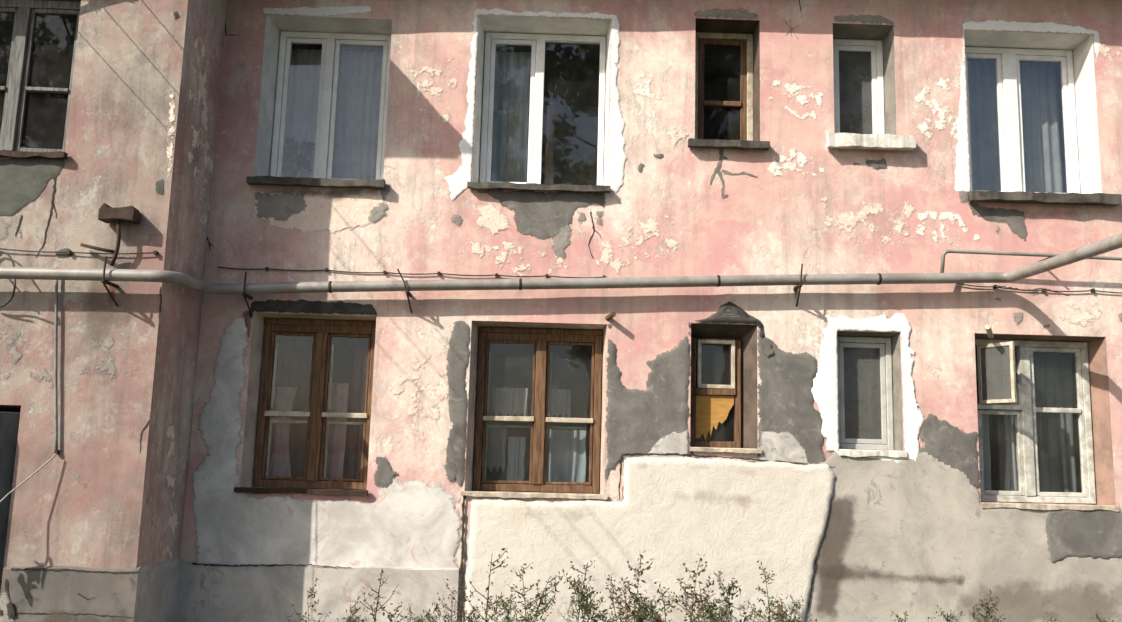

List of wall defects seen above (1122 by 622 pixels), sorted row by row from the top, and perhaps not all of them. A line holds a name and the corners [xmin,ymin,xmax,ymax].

peeling [769,77,823,119]
peeling [906,77,967,150]
peeling [0,158,65,240]
crack [15,177,57,257]
peeling [253,184,391,233]
peeling [469,189,606,276]
crack [588,212,601,259]
crack [710,149,758,199]
peeling [765,148,824,178]
spalling [688,301,773,357]
peeling [374,456,397,488]
peeling [443,437,457,482]